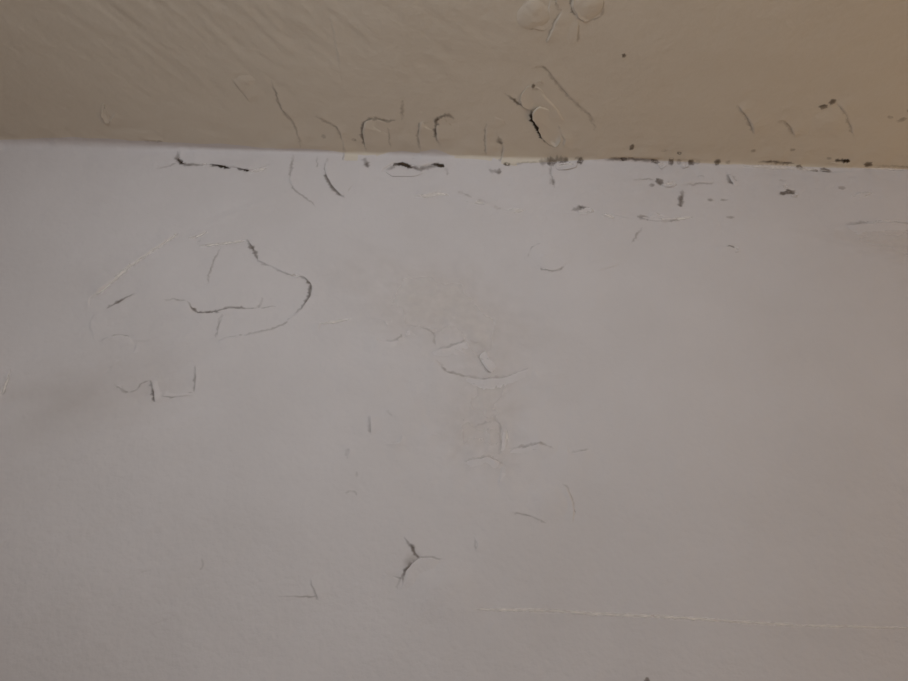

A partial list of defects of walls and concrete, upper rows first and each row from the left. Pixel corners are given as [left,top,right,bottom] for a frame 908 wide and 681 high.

crack [153,146,273,172]
crack [362,114,458,177]
crack [381,529,449,591]